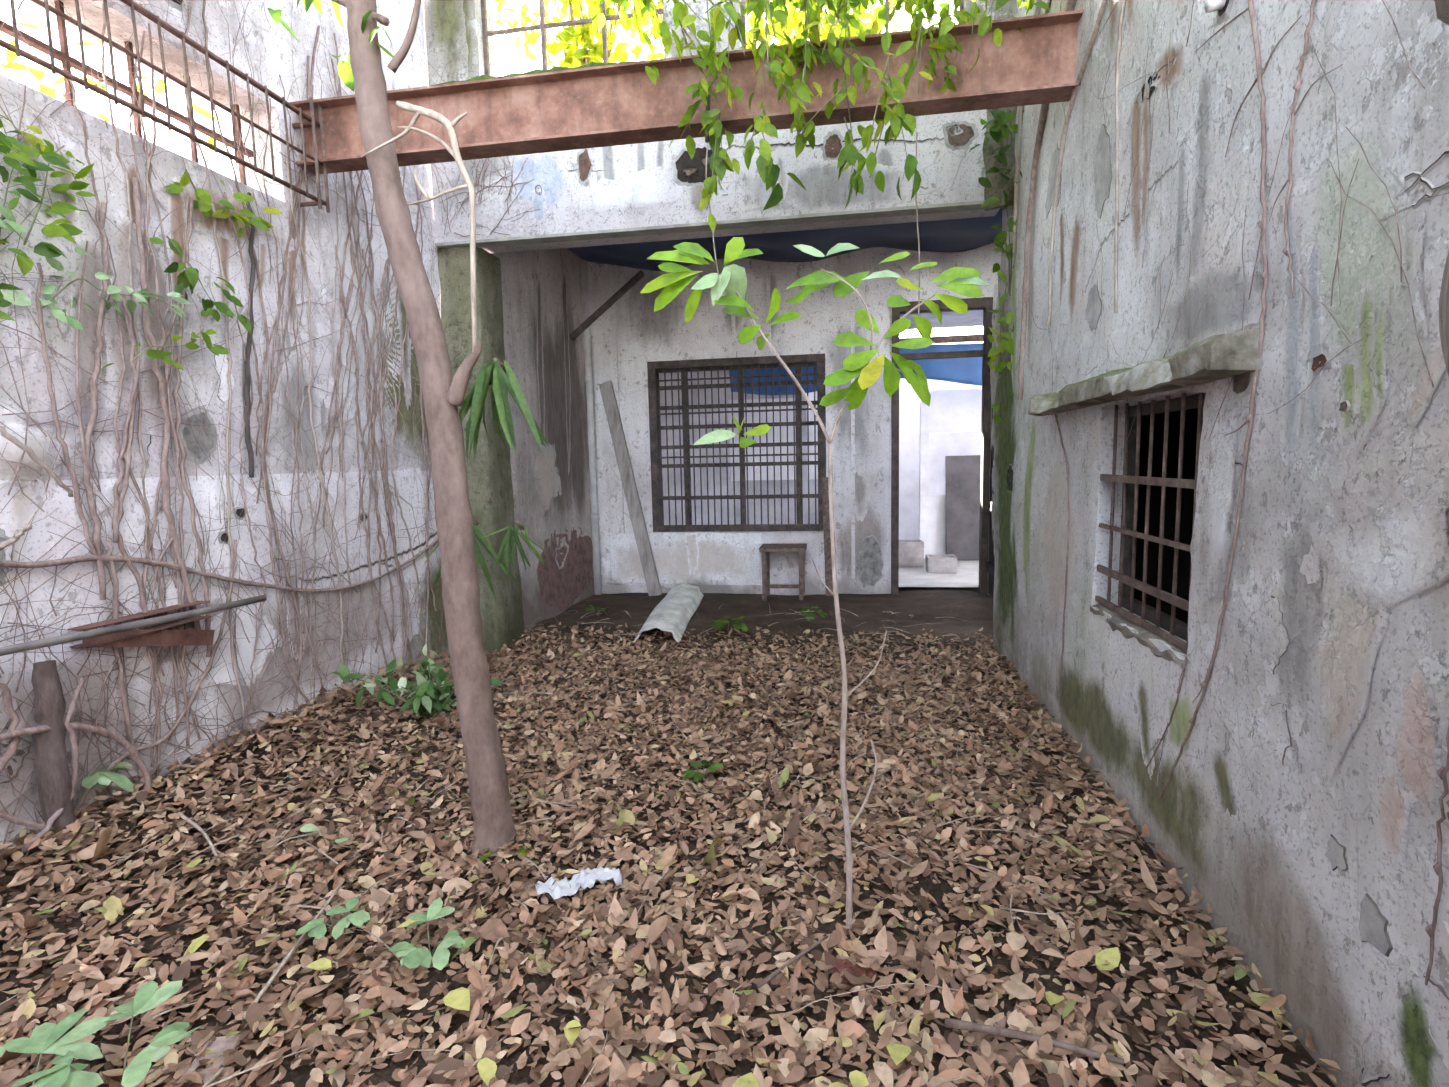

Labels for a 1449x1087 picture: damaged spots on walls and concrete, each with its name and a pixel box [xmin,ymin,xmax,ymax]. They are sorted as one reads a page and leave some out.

corrosion [21,137,35,223]
corrosion [56,153,79,245]
spalling [683,157,710,176]
spalling [942,106,1017,211]
crack [1378,149,1449,222]
leakage [1022,397,1367,1087]
peeling [1441,738,1449,816]
peeling [1325,834,1349,871]
peeling [1359,893,1393,957]